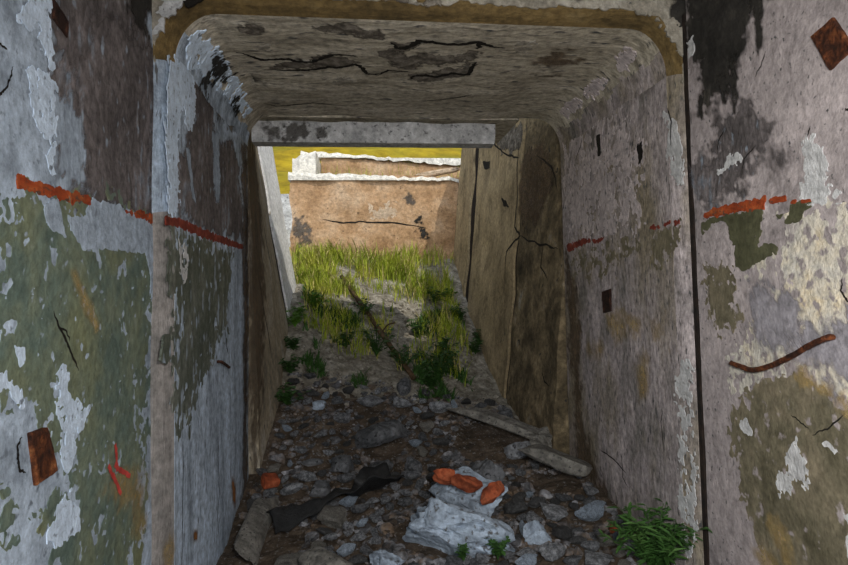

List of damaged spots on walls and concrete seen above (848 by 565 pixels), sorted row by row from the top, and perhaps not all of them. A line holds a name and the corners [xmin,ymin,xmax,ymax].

leakage [751,0,763,53]
crack [0,43,13,96]
crack [236,40,503,101]
leakage [718,54,738,114]
peeling [159,29,253,442]
crack [54,313,79,370]
peeling [0,181,153,565]
peeling [700,133,848,565]